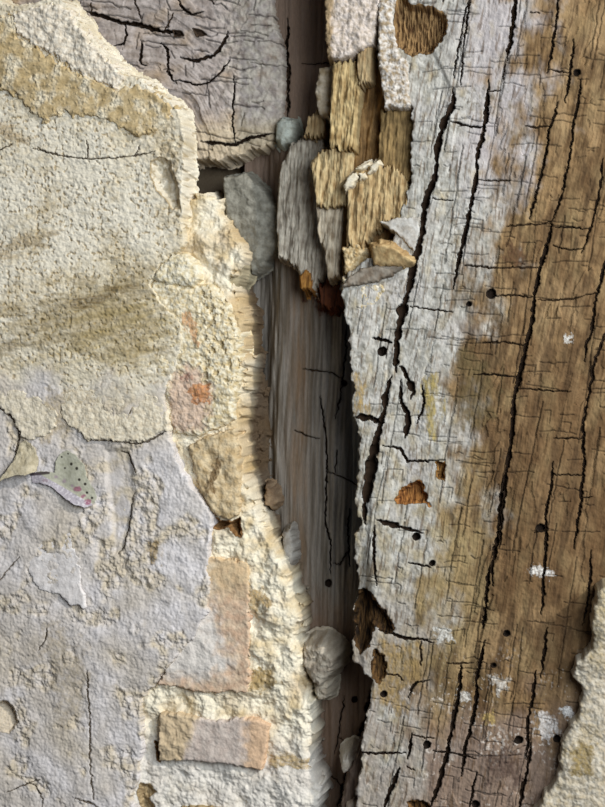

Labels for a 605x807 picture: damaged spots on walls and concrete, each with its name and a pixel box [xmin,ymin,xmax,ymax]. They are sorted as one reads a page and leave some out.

crack [86,1,272,146]
crack [33,140,155,160]
spalling [188,384,212,405]
crack [294,0,605,807]
crack [0,408,26,455]
crack [90,433,163,473]
spalling [213,517,243,538]